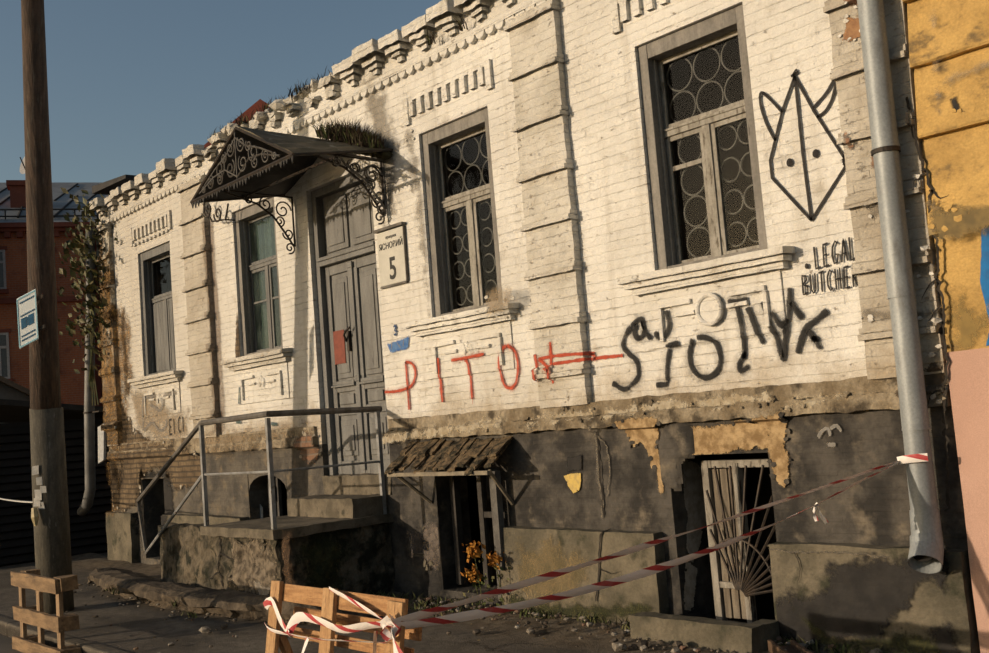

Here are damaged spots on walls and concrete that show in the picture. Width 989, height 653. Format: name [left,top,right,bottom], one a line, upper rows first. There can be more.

spalling [838,0,860,42]
peeling [101,404,201,512]
spalling [523,391,850,611]
leakage [775,549,947,647]
leakage [928,623,961,653]